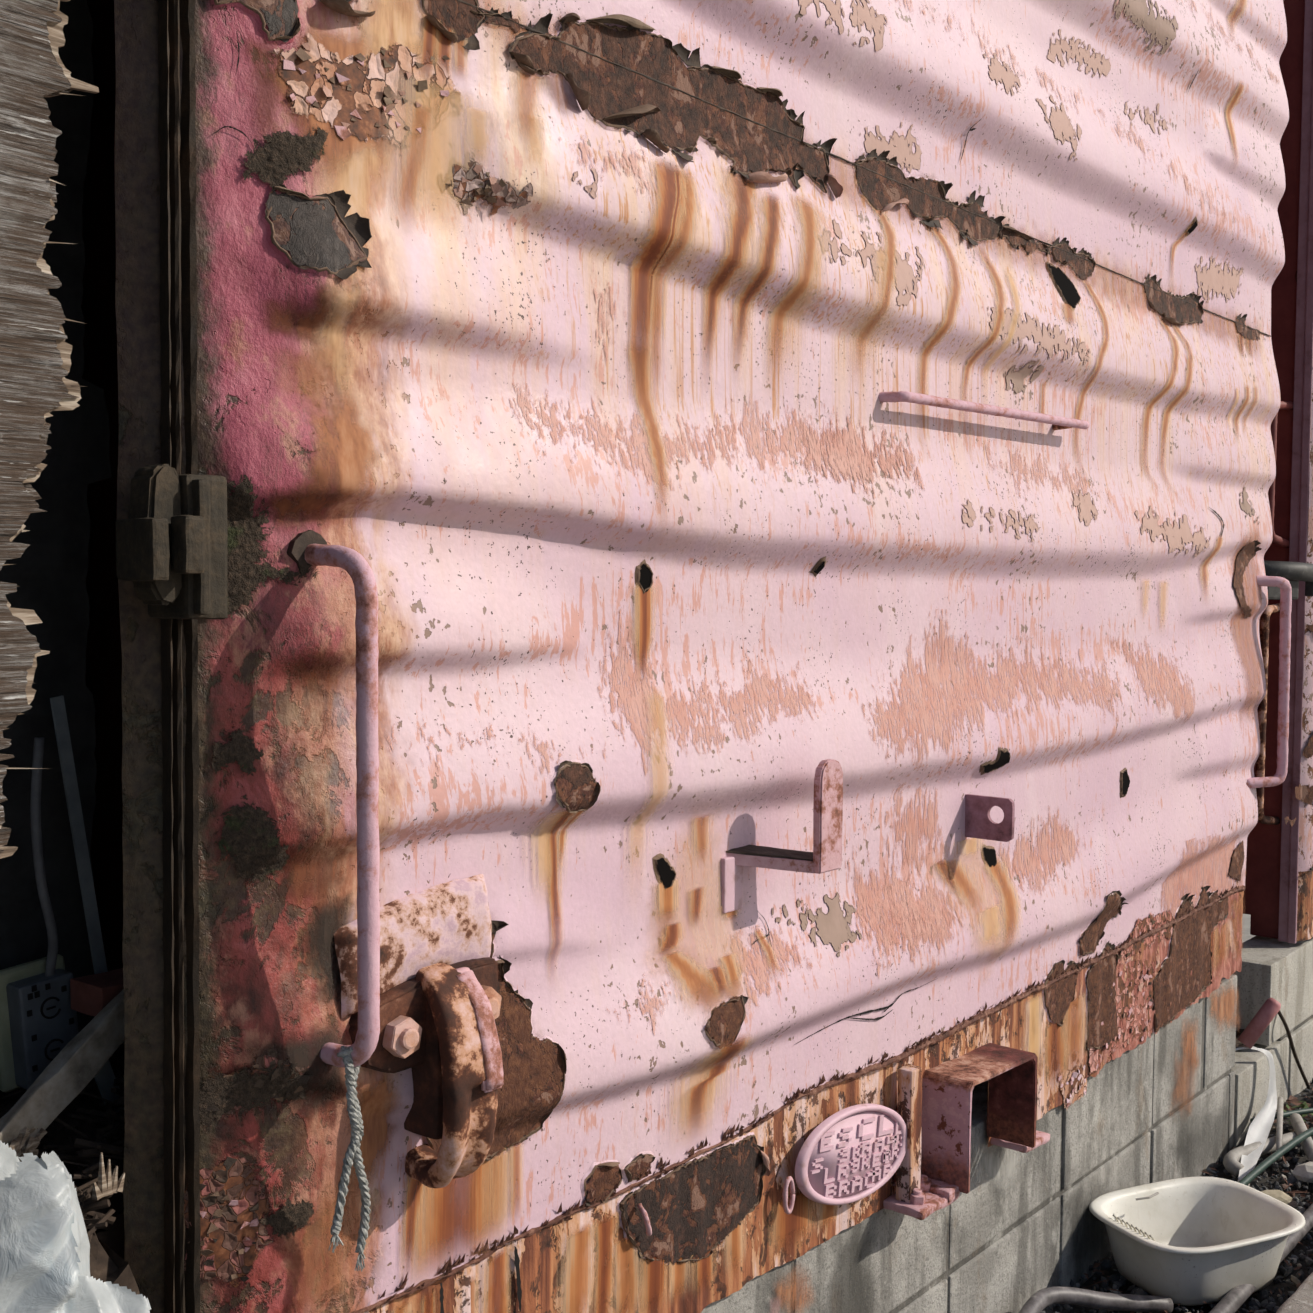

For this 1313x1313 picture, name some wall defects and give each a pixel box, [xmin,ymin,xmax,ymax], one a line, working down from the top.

spalling [1114,0,1280,84]
peeling [209,0,1111,310]
rust [630,163,700,485]
rust [705,177,781,340]
rust [920,225,961,393]
rust [1143,320,1194,447]
peeling [702,609,1195,1049]
rust [658,880,738,995]
rust [352,1081,394,1175]
rust [406,1145,523,1255]
rust [561,1217,742,1313]
peeling [581,1132,770,1265]